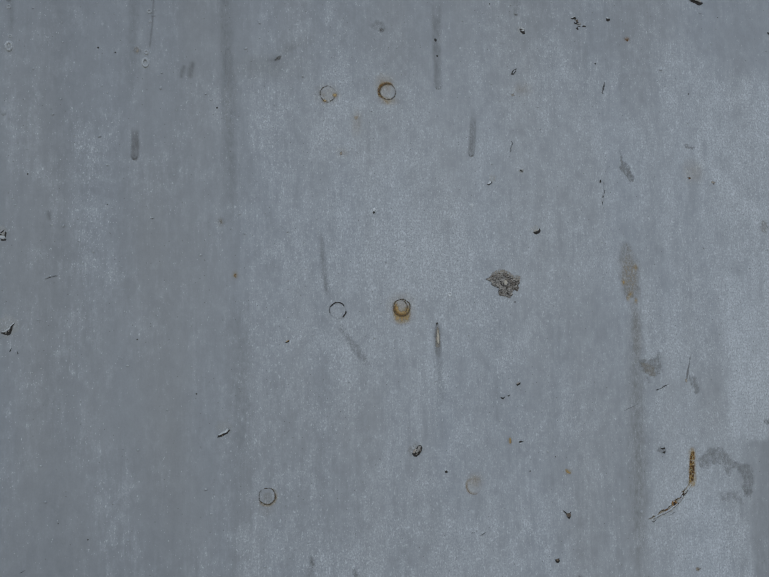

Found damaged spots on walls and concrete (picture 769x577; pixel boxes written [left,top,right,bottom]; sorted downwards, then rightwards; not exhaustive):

peeling [486,270,520,298]
rust [394,301,409,321]